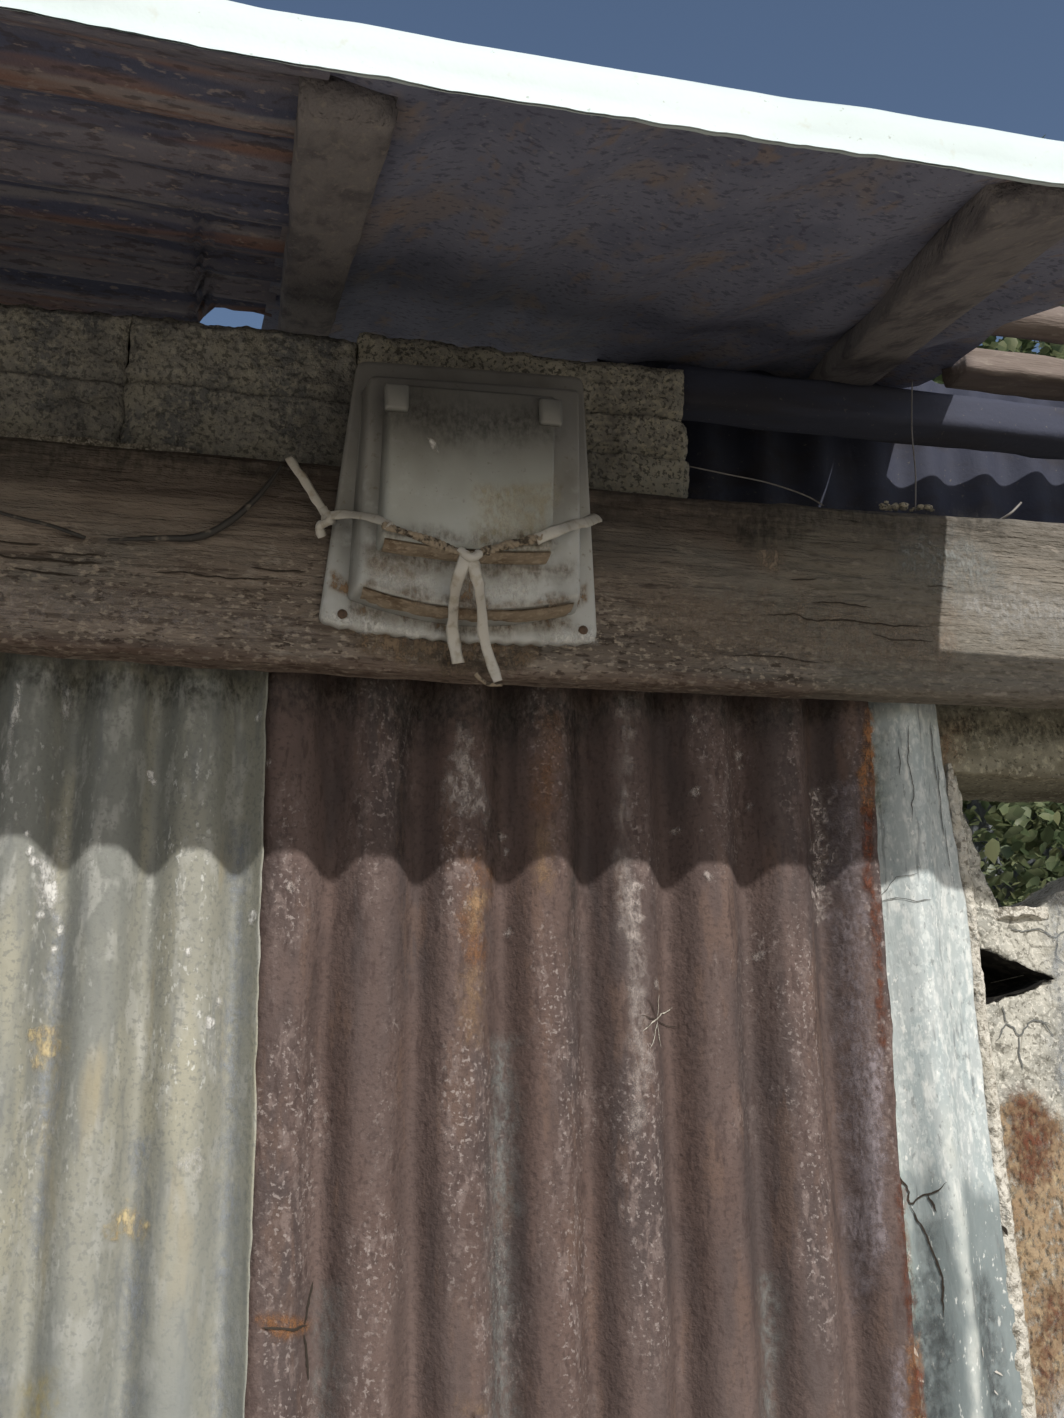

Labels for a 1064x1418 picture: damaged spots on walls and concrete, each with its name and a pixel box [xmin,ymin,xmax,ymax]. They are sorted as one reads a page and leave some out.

rust [858,714,886,1047]
hole [980,949,1054,1004]
crack [900,1177,945,1317]
rust [1000,1092,1064,1418]